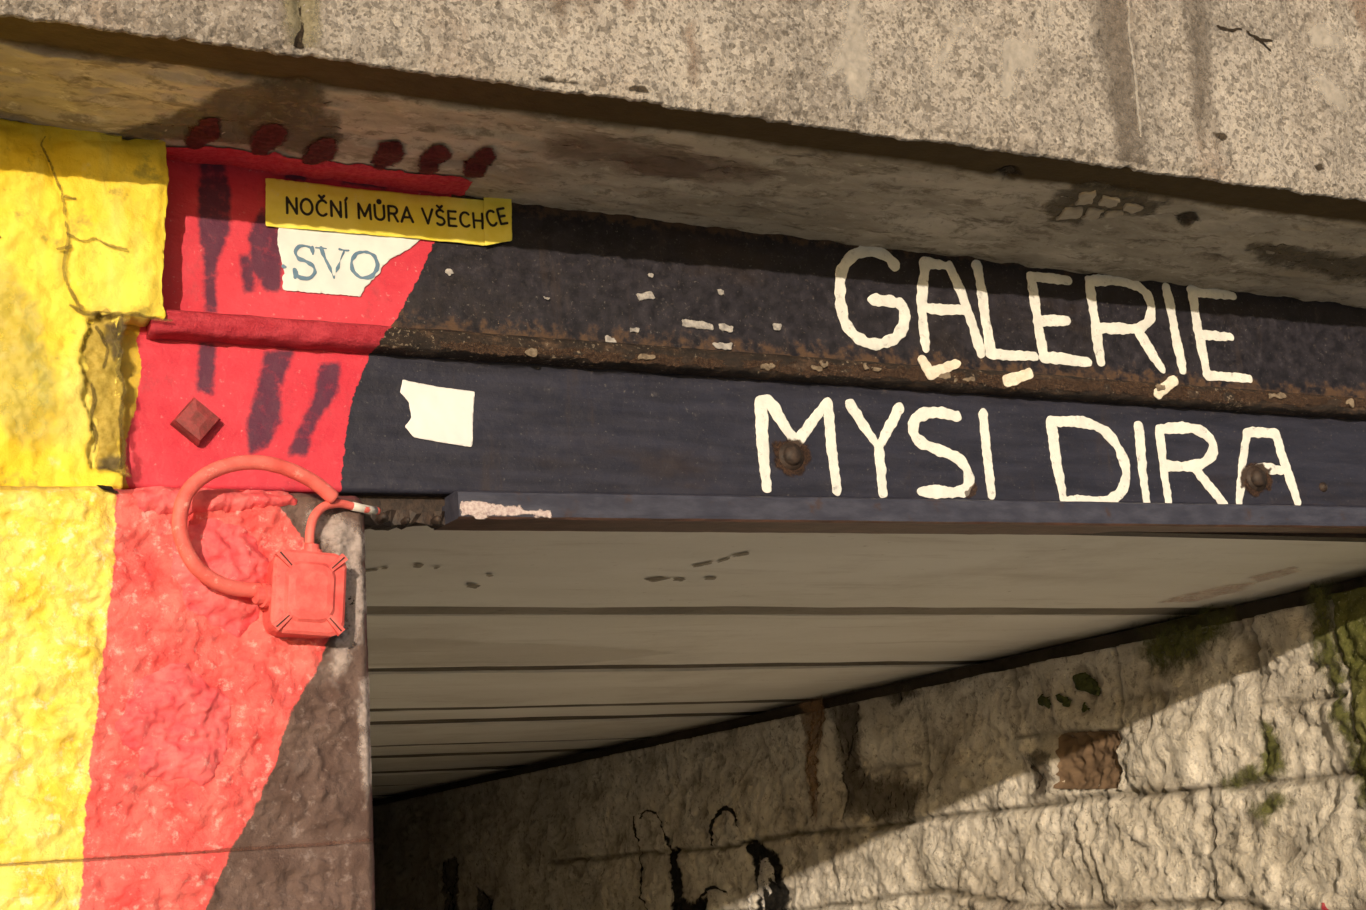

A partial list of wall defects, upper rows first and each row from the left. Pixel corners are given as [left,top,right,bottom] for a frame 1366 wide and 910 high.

crack [294,6,304,48]
flaking render [1046,182,1199,226]
crack [40,137,172,321]
rust [441,341,1366,408]
rust [772,439,811,476]
rust [1240,463,1273,497]
rust [798,697,826,816]